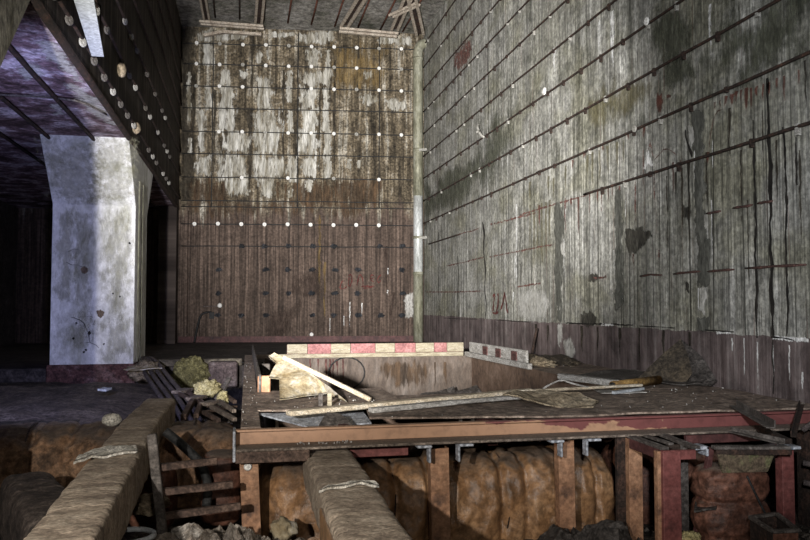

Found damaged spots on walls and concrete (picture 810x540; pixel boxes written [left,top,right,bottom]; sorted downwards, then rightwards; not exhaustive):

damp [179,27,201,200]
damp [244,36,255,185]
damp [331,42,385,171]
rust [714,76,785,108]
damp [666,151,695,259]
crack [753,78,798,394]
crack [566,321,673,329]